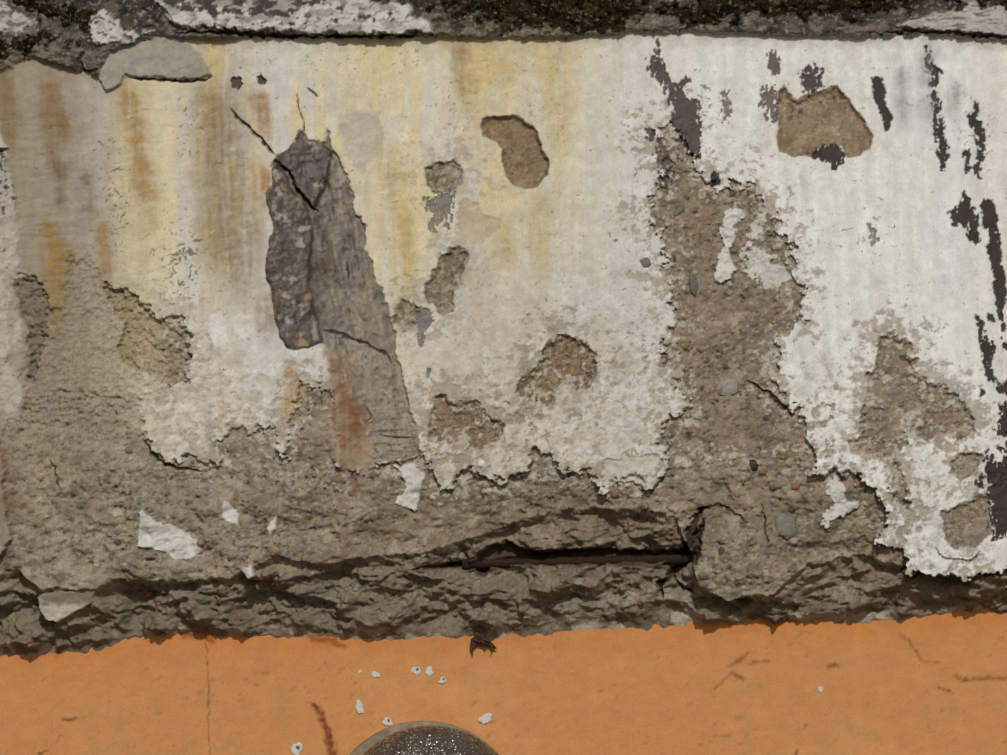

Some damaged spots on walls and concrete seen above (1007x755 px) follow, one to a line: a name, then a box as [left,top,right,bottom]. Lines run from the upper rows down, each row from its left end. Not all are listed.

crack [231,108,273,153]
peeling [338,110,386,173]
spalling [480,114,550,189]
spalling [758,49,894,171]
peeling [924,44,987,179]
spalling [647,38,813,472]
spalling [0,129,1007,657]
crack [411,502,769,595]